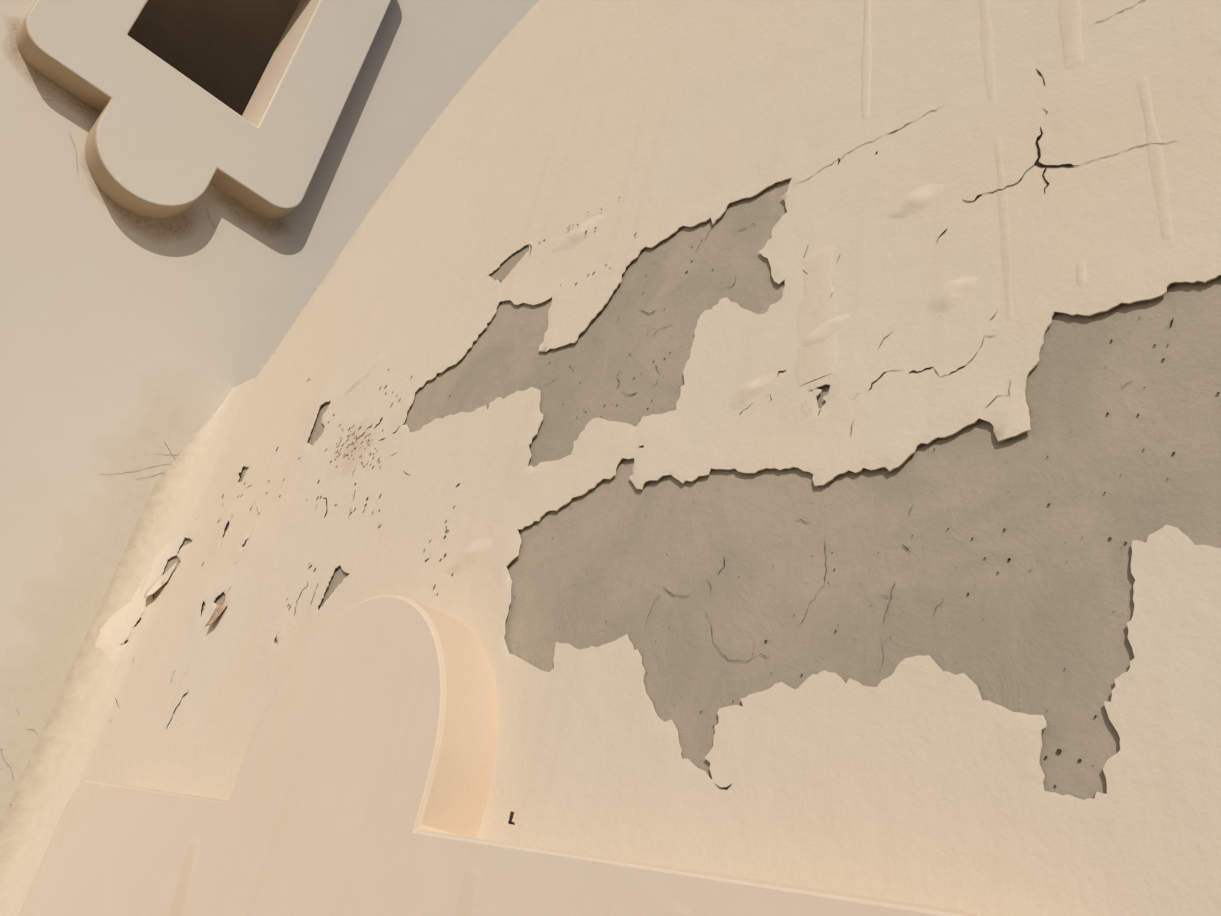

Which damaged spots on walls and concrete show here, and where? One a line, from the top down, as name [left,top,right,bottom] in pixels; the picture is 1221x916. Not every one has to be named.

crack [796,107,939,184]
crack [962,69,1172,202]
peeling [379,179,791,467]
peeling [308,401,337,467]
peeling [144,538,192,599]
peeling [201,592,227,627]
peeling [318,566,349,610]
peeling [504,276,1221,800]